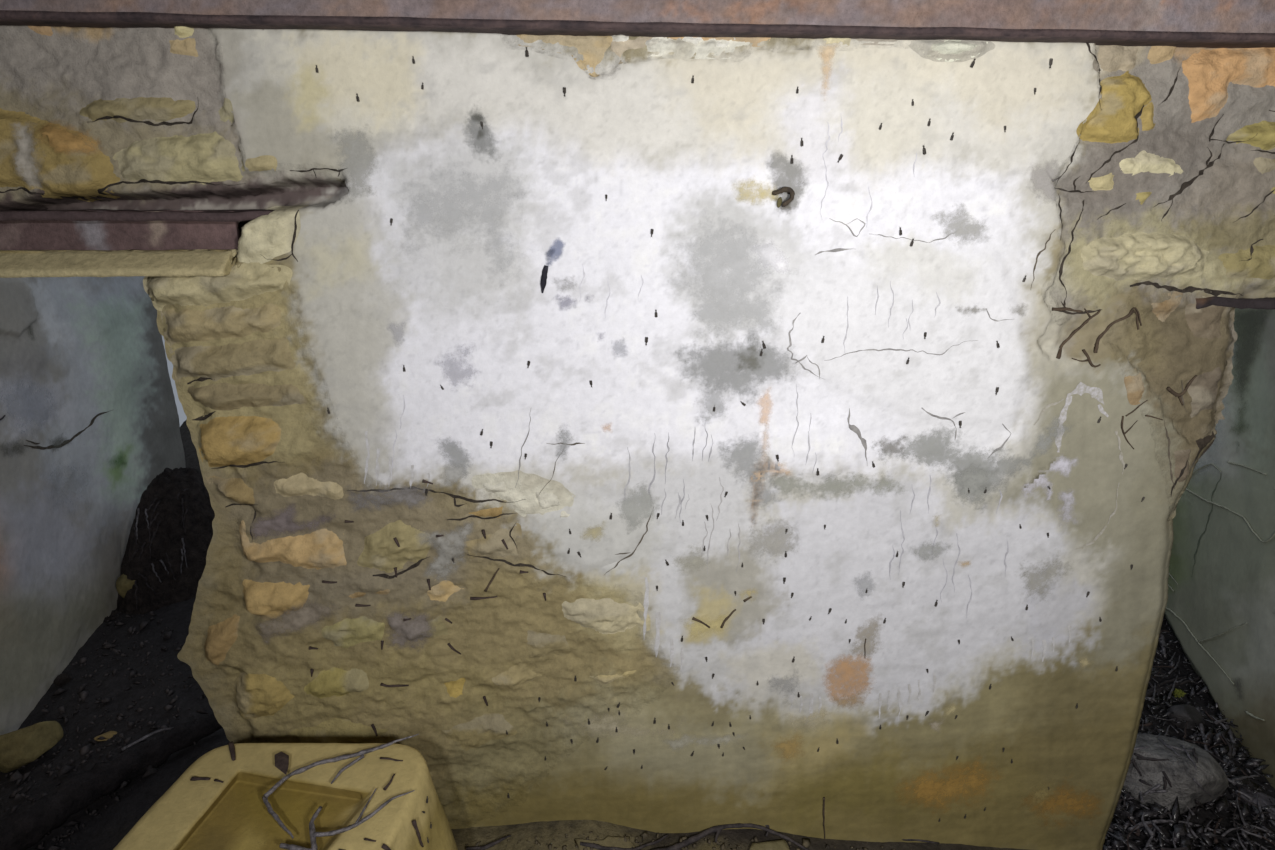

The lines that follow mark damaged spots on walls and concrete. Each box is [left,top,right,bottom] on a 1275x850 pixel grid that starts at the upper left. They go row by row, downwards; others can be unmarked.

flaking render [0,25,683,829]
crack [347,410,585,579]
leakage [740,155,806,209]
leakage [678,337,895,504]
crack [847,408,867,460]
crack [815,218,953,255]
crack [787,309,1012,379]
leakage [883,431,1030,611]
leakage [1024,458,1076,519]
crack [1031,67,1275,315]
flaking render [1041,43,1275,522]
rust [828,659,869,705]